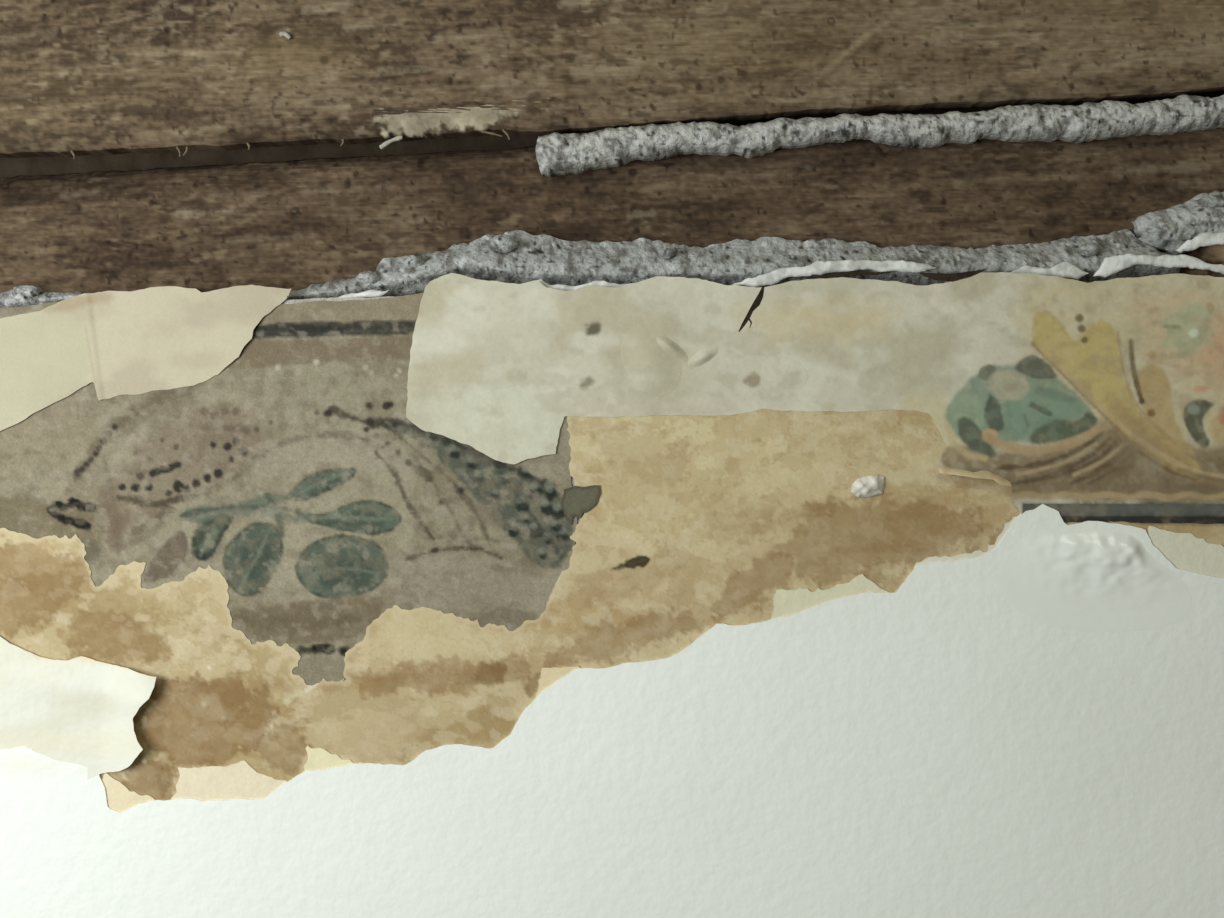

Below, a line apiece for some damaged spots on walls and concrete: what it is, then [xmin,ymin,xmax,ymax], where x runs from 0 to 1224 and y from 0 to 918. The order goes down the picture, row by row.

spalling [286,190,1224,300]
spalling [0,285,84,308]
crack [738,287,764,332]
water stain [614,556,650,569]
peeling [0,636,157,780]